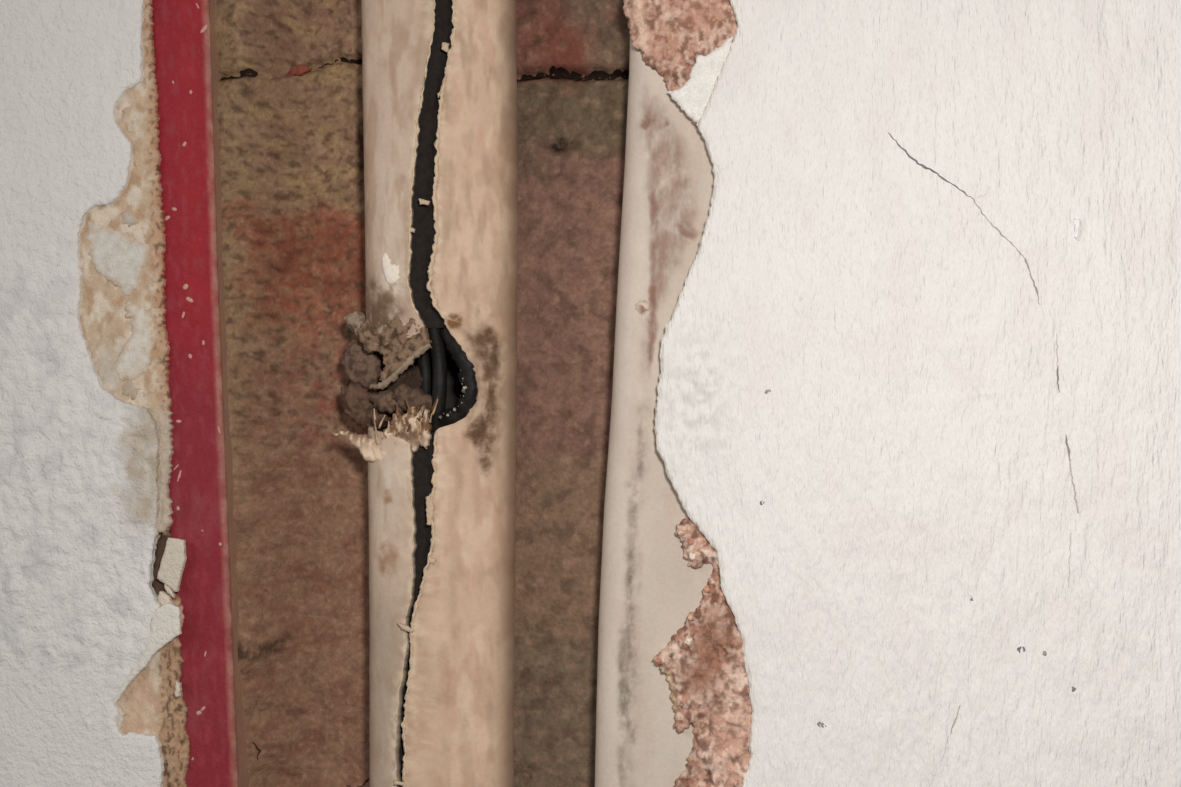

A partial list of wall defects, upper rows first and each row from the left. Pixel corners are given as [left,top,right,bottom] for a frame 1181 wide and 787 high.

flaking render [623,0,738,127]
peeling [381,253,400,285]
crack [889,133,1040,305]
flaking render [79,0,205,787]
crack [1054,334,1062,393]
crack [1065,436,1079,587]
flaking render [652,516,753,787]